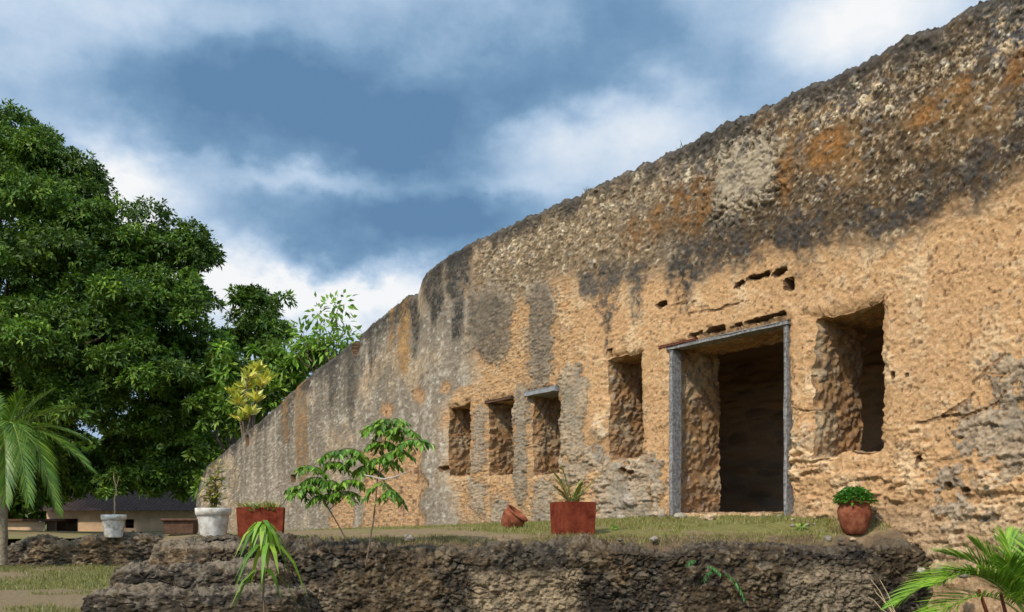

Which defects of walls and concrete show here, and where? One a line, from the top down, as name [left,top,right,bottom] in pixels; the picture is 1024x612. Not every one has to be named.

water stain [845,179,951,238]
water stain [669,219,760,303]
water stain [410,248,505,357]
water stain [579,263,647,346]
crack [909,352,1006,425]
peeling [976,352,1024,391]
peeling [558,443,634,488]
peeling [931,479,996,531]